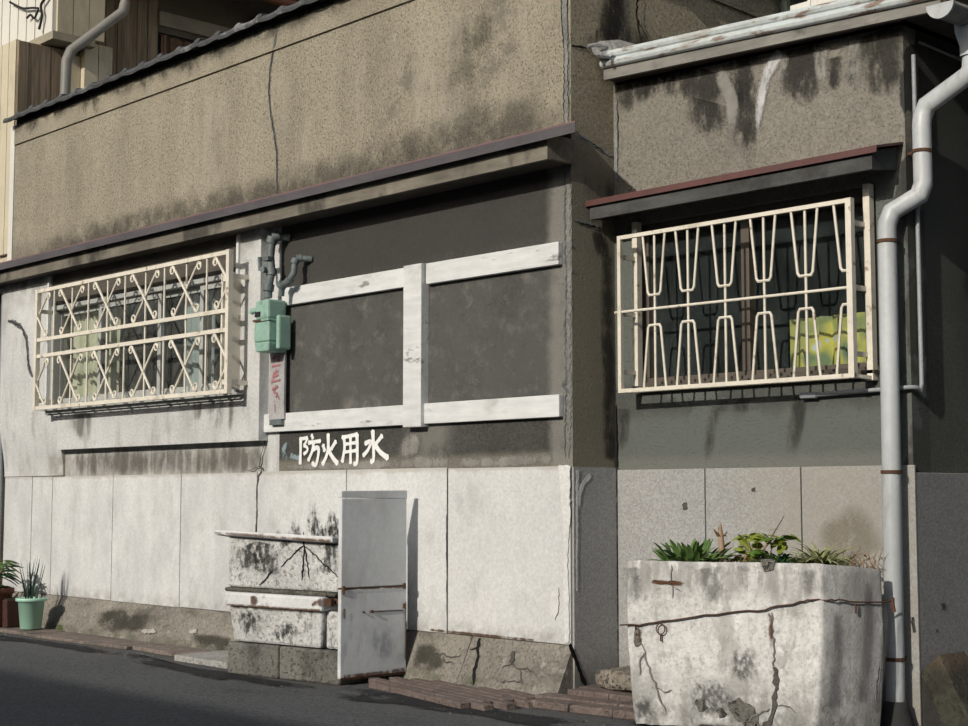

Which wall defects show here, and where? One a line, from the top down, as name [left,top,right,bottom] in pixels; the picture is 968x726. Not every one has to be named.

water stain [595,0,647,44]
crack [636,0,648,39]
crack [268,29,278,194]
water stain [619,26,902,144]
crack [8,319,33,377]
crack [248,441,265,532]
water stain [237,512,339,573]
crack [431,638,480,684]
crack [500,663,536,685]